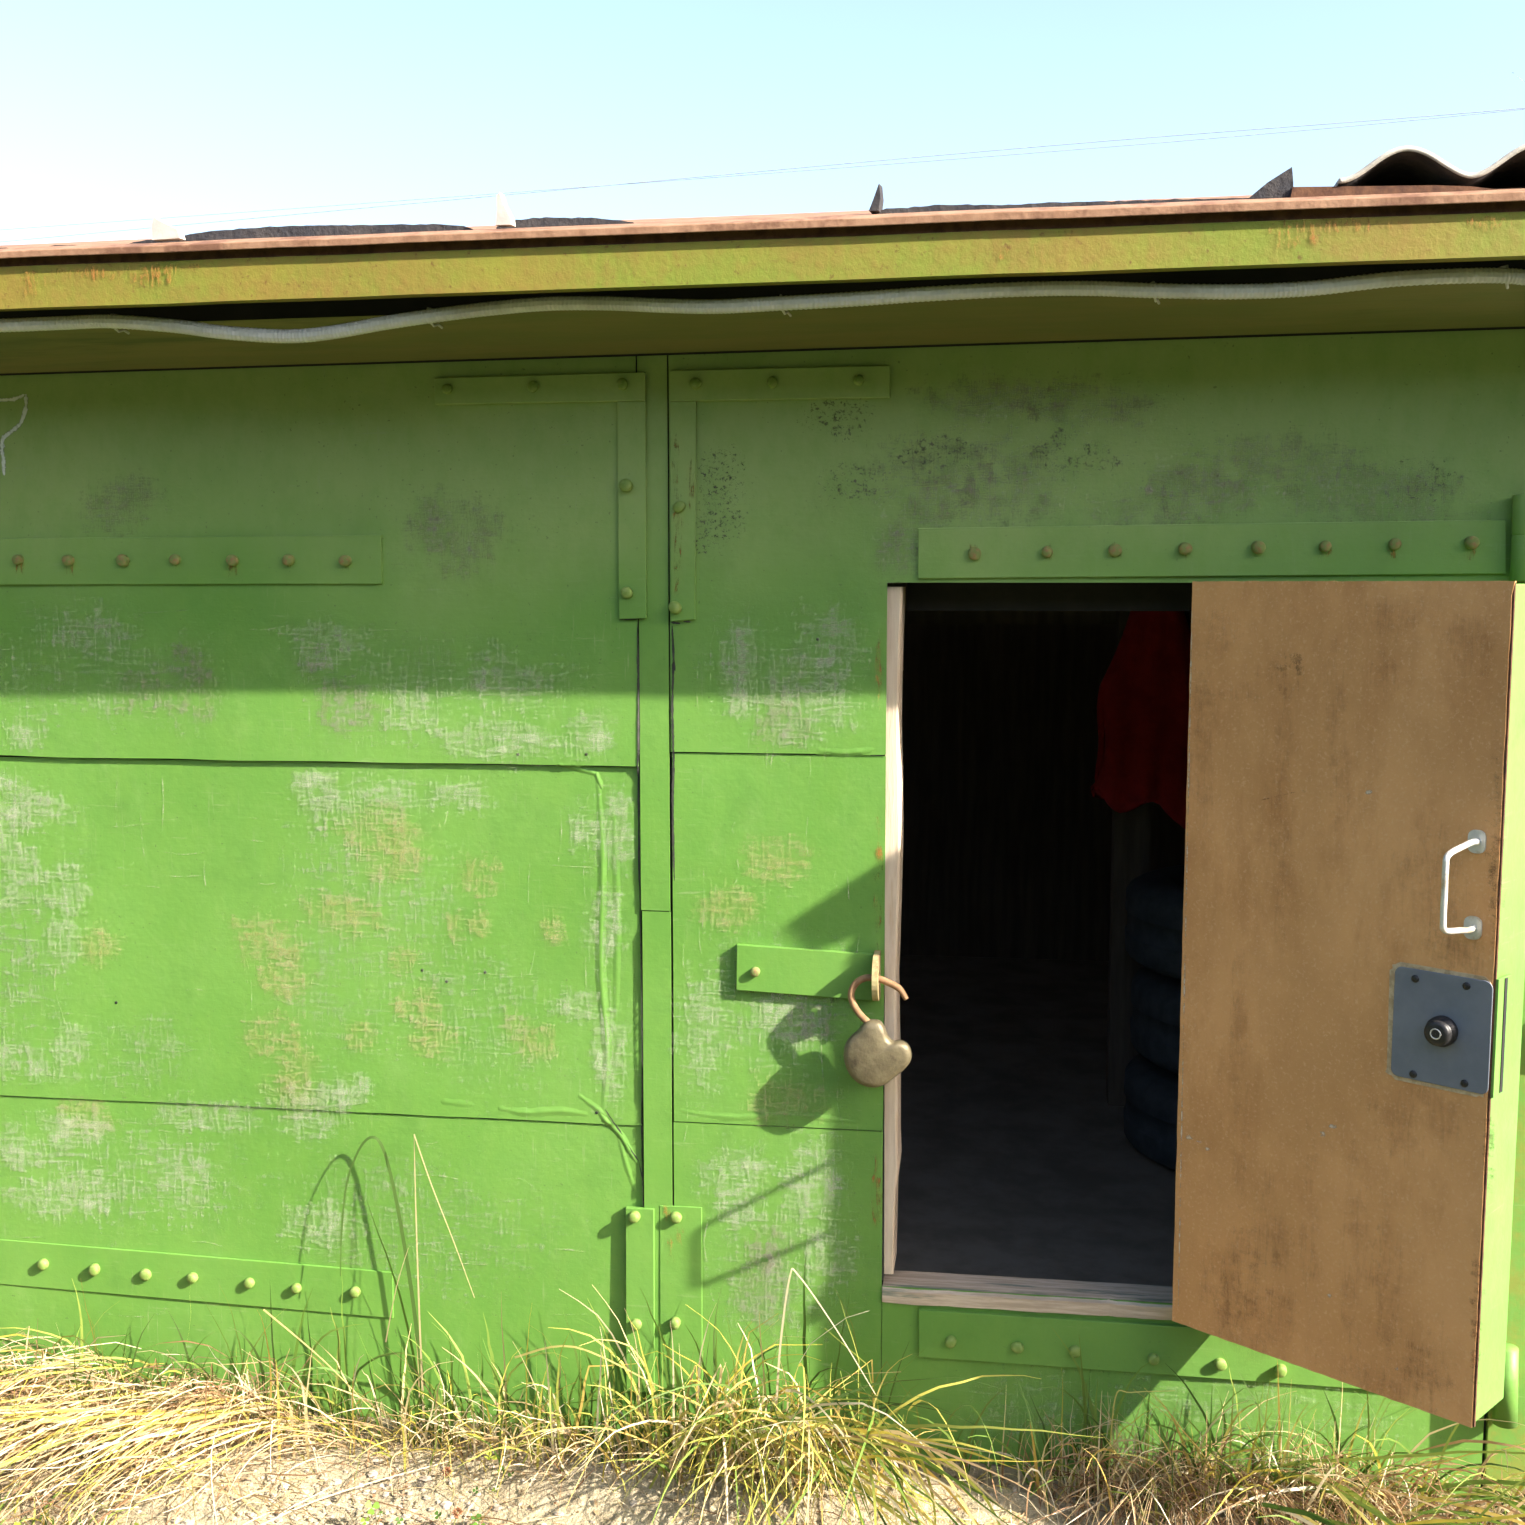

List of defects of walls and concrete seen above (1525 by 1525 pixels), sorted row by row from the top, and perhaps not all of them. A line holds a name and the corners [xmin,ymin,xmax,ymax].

corrosion [133,264,198,286]
peeling [0,777,110,963]
peeling [294,772,419,937]
peeling [246,1018,369,1138]
peeling [1,1102,127,1213]